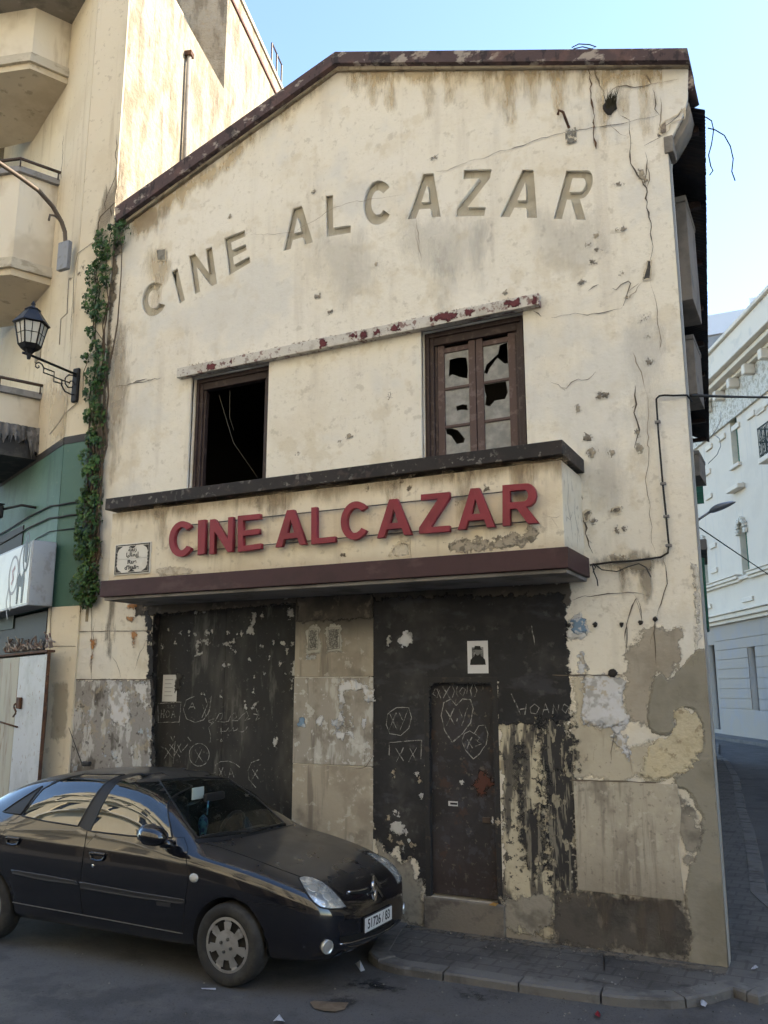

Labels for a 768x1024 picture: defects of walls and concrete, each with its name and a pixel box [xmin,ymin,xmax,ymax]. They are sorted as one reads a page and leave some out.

peeling [496,289,537,308]
peeling [413,308,475,322]
peeling [349,321,400,339]
crack [431,69,679,660]
spalling [443,525,539,553]
flaking render [376,810,424,925]